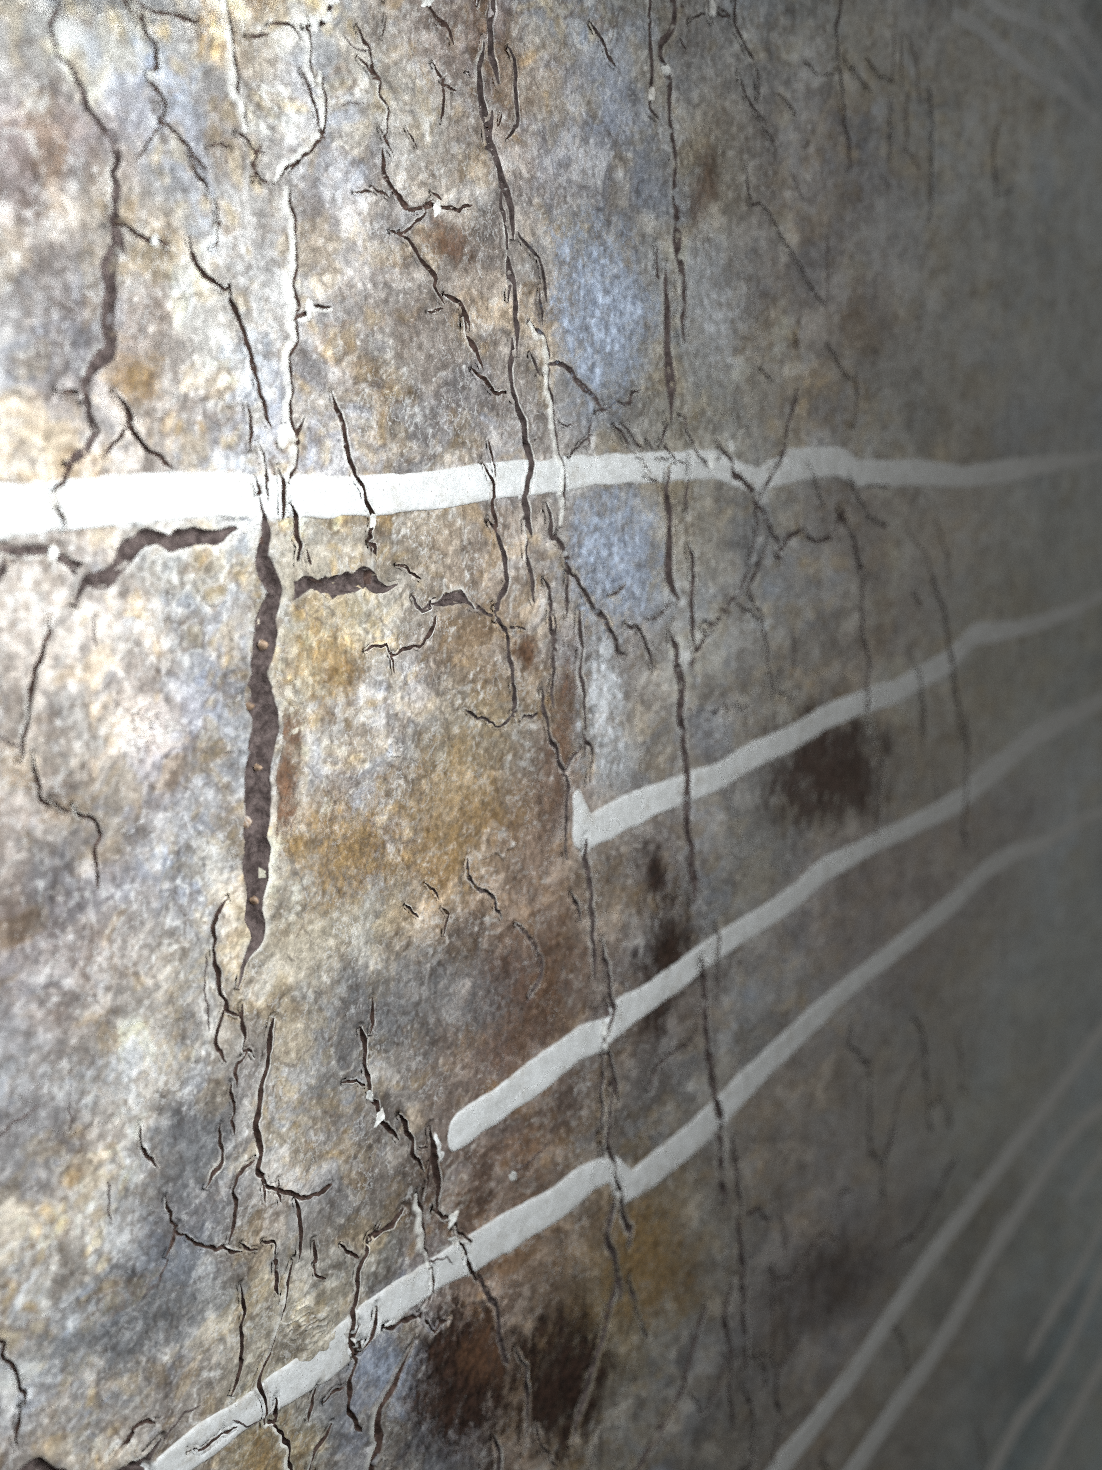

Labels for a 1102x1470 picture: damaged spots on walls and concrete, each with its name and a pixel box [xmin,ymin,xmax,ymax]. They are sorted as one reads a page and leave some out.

crack [805,0,936,224]
crack [0,0,559,1470]
crack [343,0,891,1446]
leakage [757,718,892,835]
crack [907,517,972,848]
crack [632,923,968,1470]
leakage [362,1289,617,1470]
crack [587,1426,602,1470]